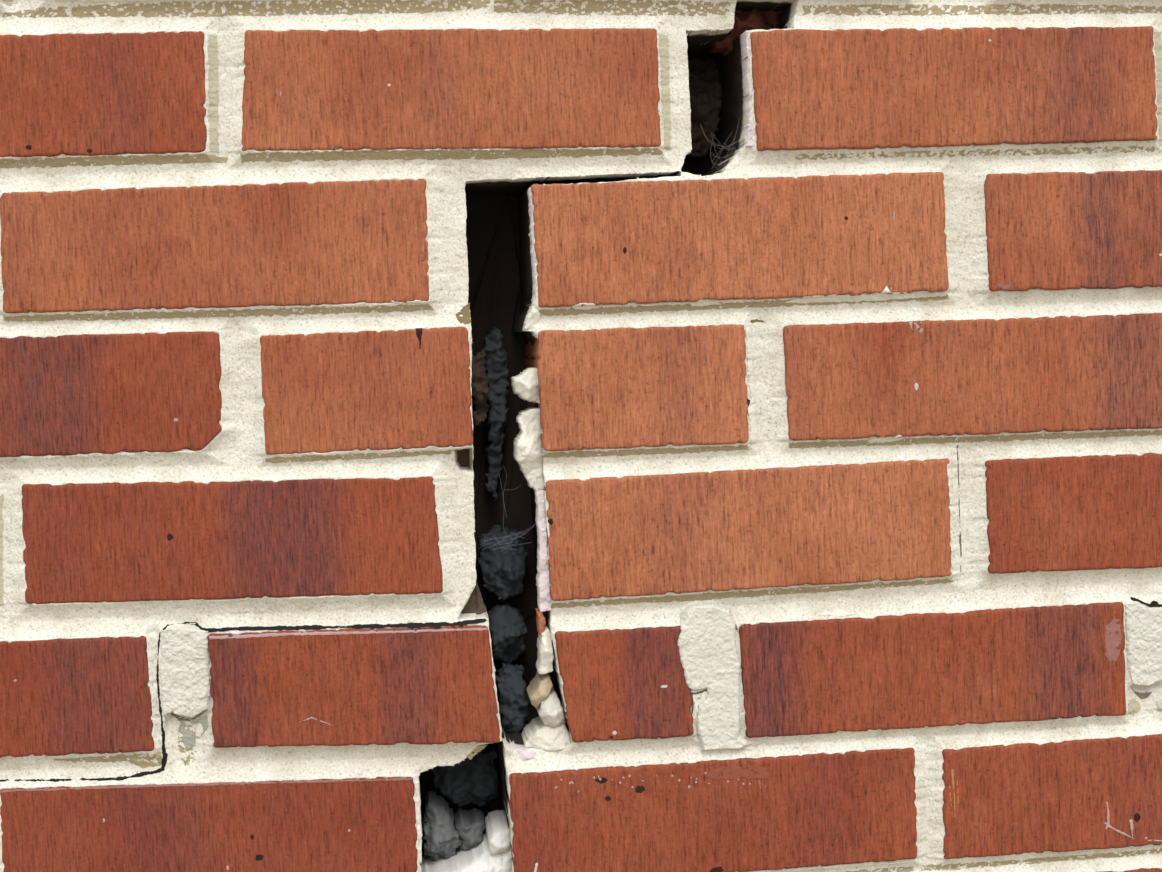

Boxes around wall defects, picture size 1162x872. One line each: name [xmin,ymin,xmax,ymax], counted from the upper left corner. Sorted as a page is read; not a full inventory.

crack [0,2,791,857]
crack [955,445,963,572]